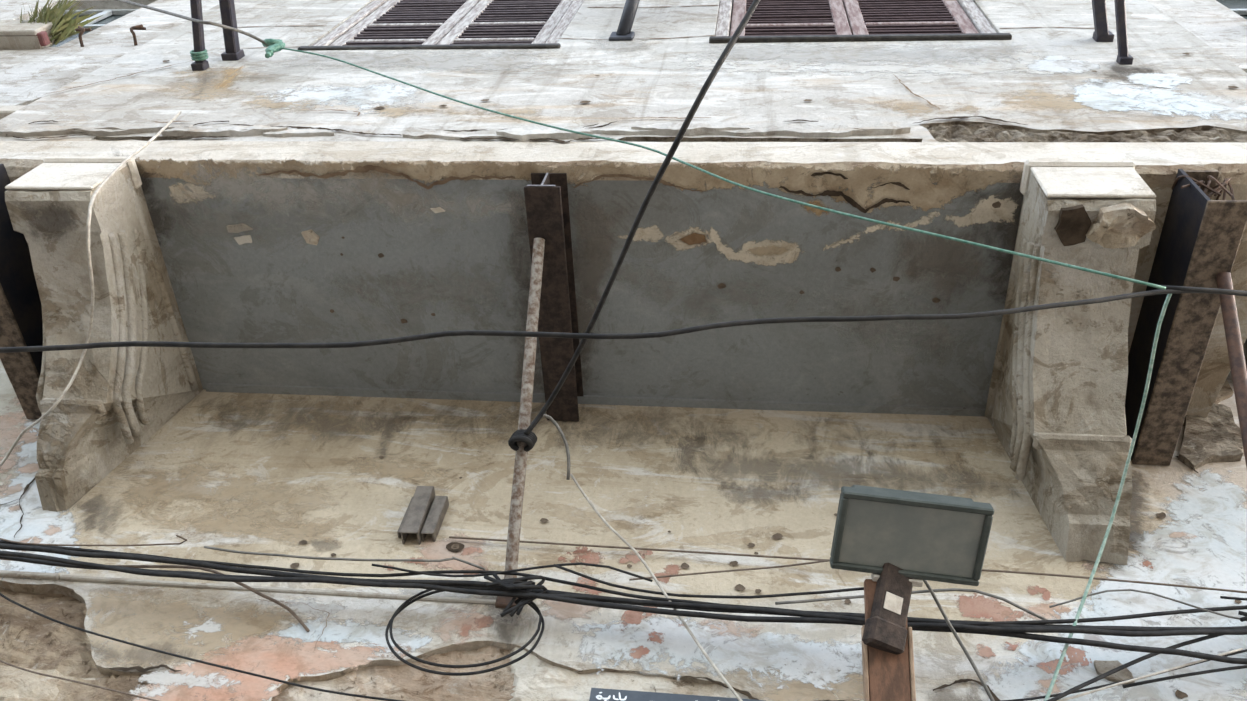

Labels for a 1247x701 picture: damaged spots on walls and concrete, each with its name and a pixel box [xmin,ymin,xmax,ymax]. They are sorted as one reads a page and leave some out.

damp [879,99,978,116]
peeling [616,50,1247,143]
damp [1005,89,1110,117]
damp [1111,66,1153,78]
spalling [135,158,1023,213]
crack [0,478,35,538]
spalling [0,398,863,701]
peeling [955,379,1247,701]